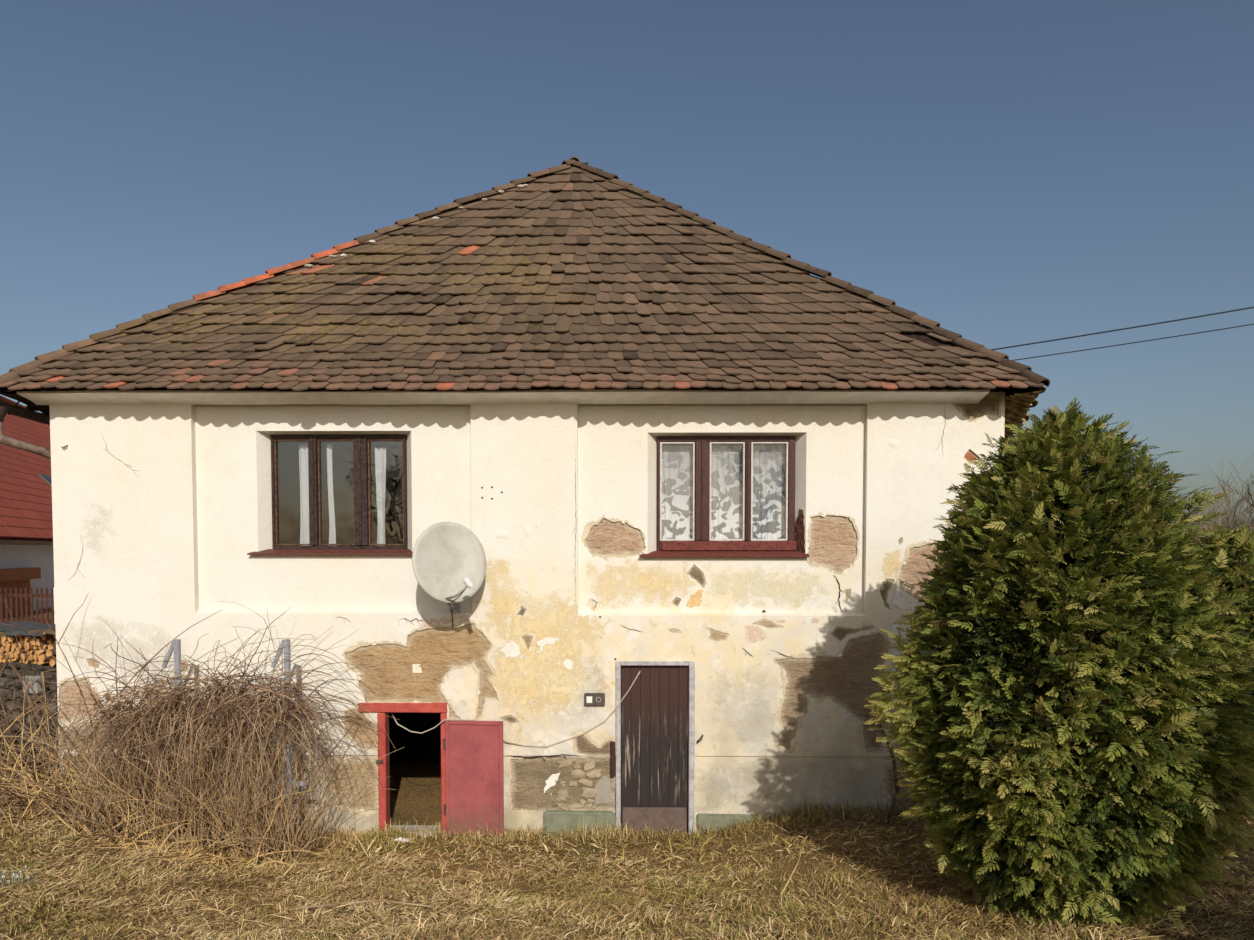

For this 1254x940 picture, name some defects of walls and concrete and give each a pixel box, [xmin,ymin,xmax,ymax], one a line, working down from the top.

spalling [963,449,983,479]
spalling [795,509,859,574]
spalling [328,515,706,817]
spalling [708,628,729,641]
spalling [752,610,783,629]
spalling [774,536,944,753]